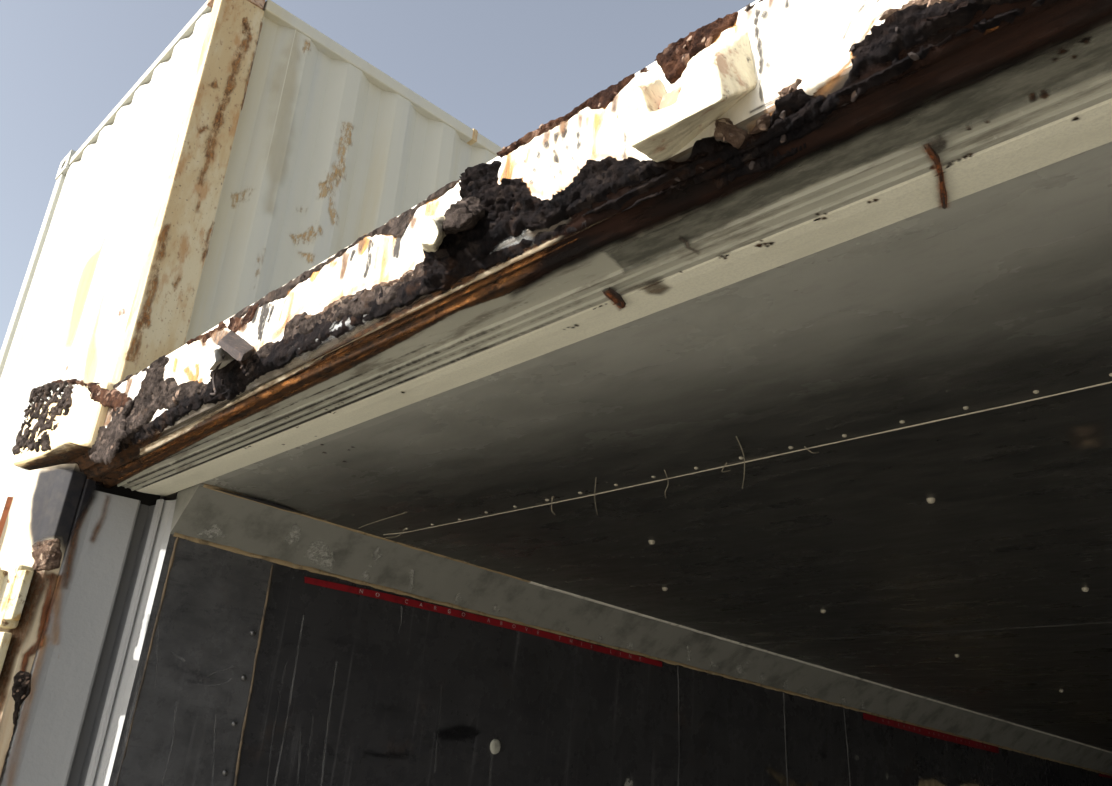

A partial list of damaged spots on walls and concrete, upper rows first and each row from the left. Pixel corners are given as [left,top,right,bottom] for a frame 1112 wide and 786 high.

rust [22,0,1112,587]
rust [0,570,62,715]
rust [0,716,19,786]